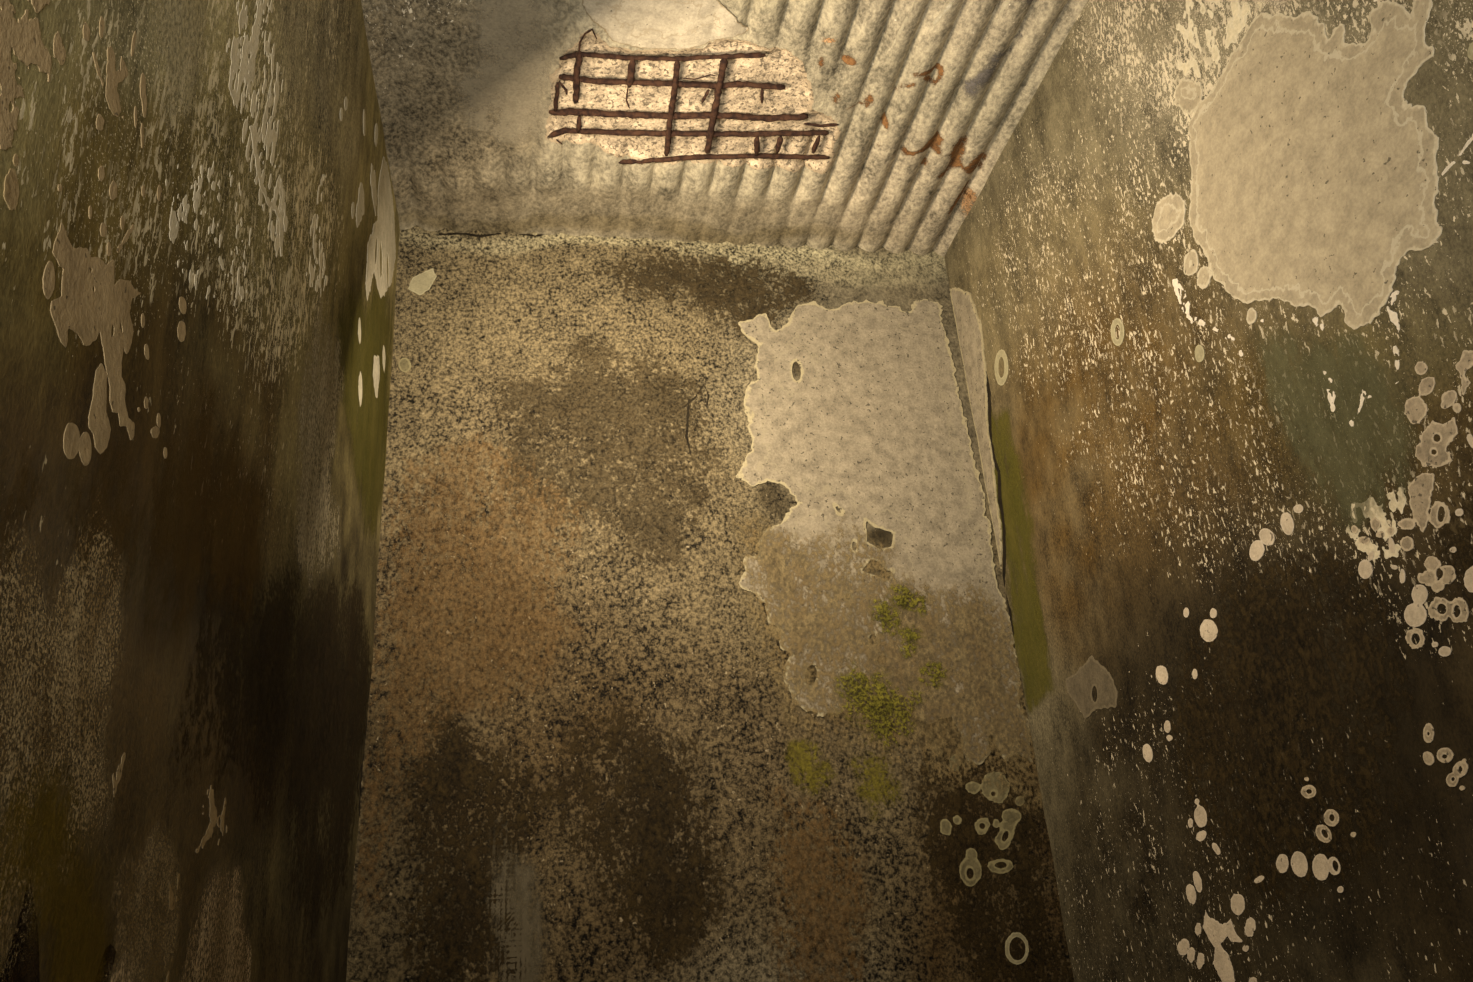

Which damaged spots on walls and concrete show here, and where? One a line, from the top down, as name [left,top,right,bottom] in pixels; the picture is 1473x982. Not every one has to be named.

peeling [42,206,167,458]
peeling [340,97,396,301]
spalling [545,28,844,174]
flaking render [1152,0,1443,330]
damp [0,488,123,956]
damp [176,294,372,934]
damp [400,704,726,982]
flaking render [736,287,1033,874]
peeling [1188,799,1221,855]
peeling [1177,871,1257,982]
peeling [1254,809,1356,893]
peeling [1346,350,1473,657]